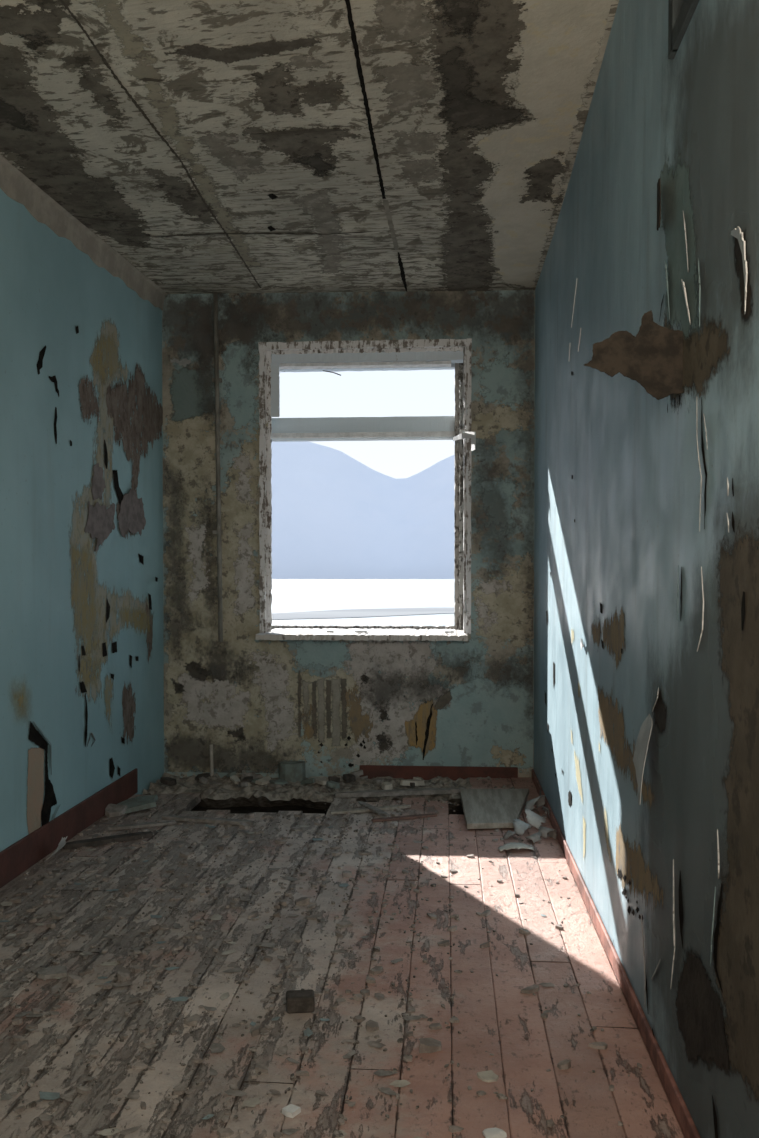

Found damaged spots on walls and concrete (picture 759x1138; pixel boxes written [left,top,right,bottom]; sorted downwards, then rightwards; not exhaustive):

peeling [731,226,753,321]
flaking render [571,155,730,532]
flaking render [69,319,554,773]
peeling [571,603,626,668]
peeling [27,721,61,834]
peeling [555,731,582,806]